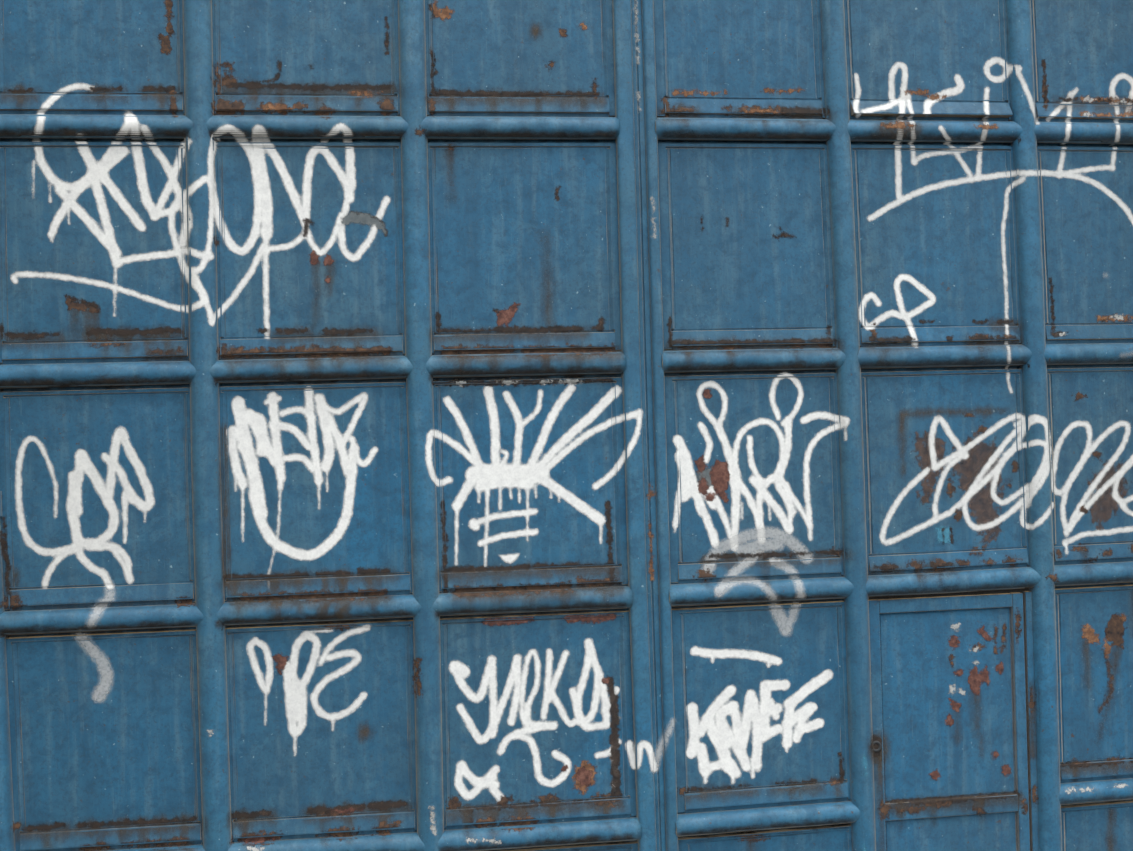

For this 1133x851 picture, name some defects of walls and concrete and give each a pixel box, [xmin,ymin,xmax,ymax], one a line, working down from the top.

corrosion [211,72,396,119]
corrosion [428,78,603,116]
corrosion [661,87,830,119]
corrosion [0,323,63,343]
corrosion [86,326,184,360]
corrosion [434,312,619,360]
corrosion [1048,278,1065,337]
corrosion [1097,314,1133,322]
corrosion [445,677,622,844]
corrosion [11,816,197,851]
corrosion [229,809,283,851]
corrosion [307,800,410,841]